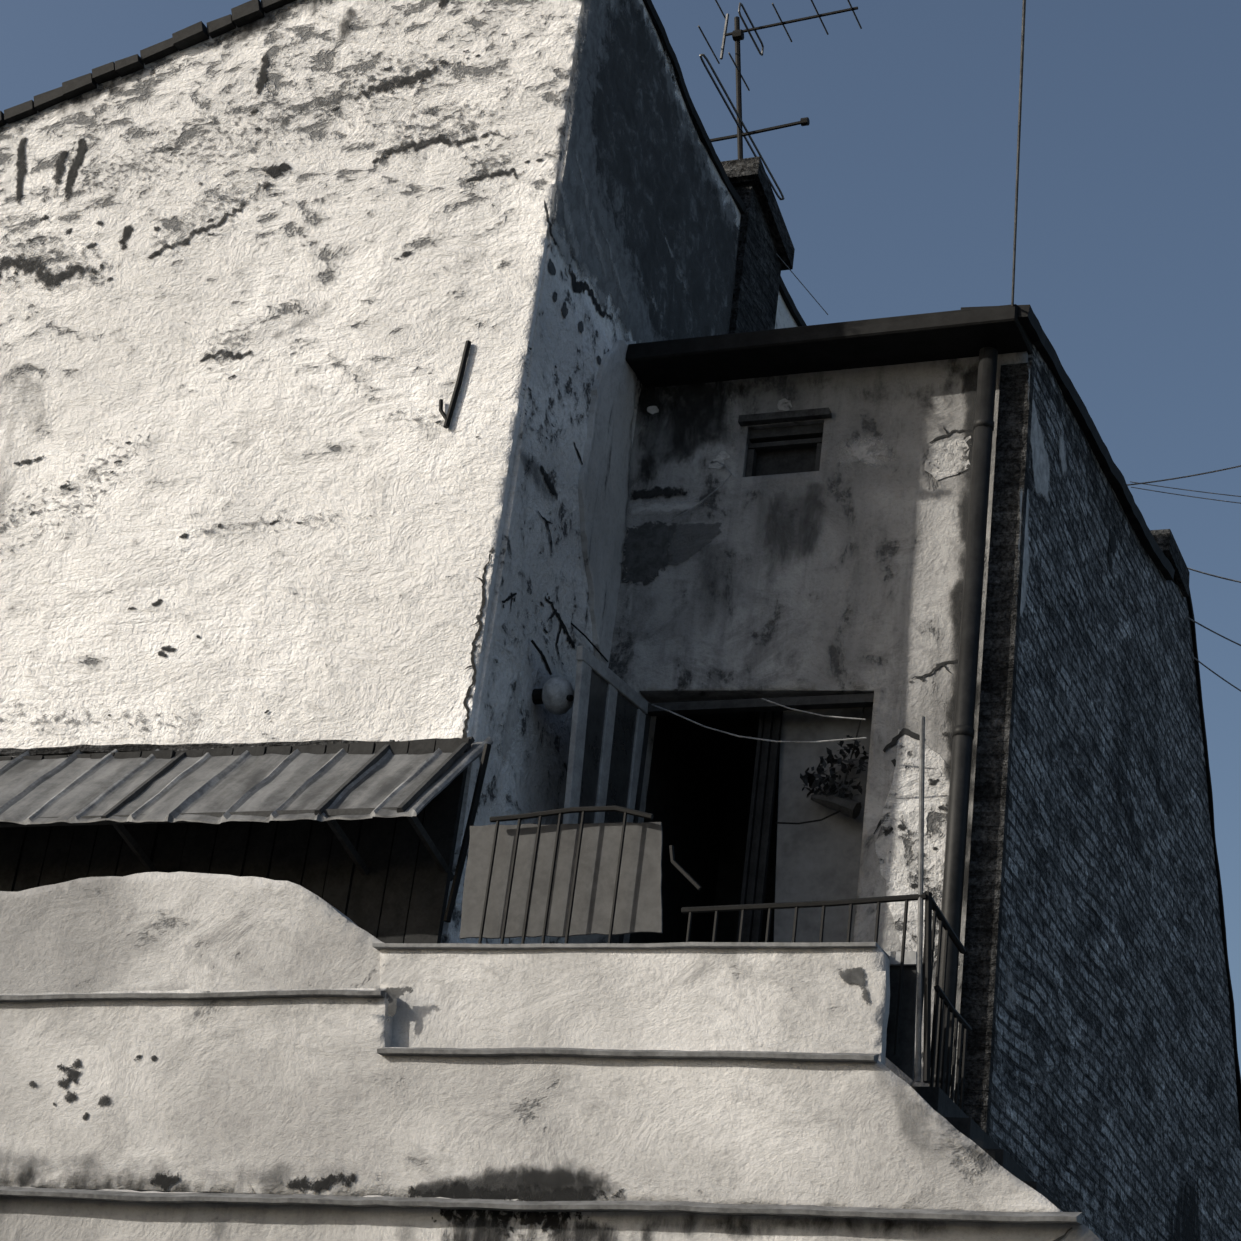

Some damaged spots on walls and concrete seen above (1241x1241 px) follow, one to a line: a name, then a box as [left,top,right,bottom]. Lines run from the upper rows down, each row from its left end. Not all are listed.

peeling [87,0,740,343]
peeling [200,304,255,381]
spalling [519,332,557,444]
spalling [924,436,971,480]
crack [462,547,575,738]
spalling [875,729,950,965]
spalling [53,1059,81,1106]
spalling [82,1095,112,1120]
damp [3,1158,184,1192]
damp [408,1167,626,1241]